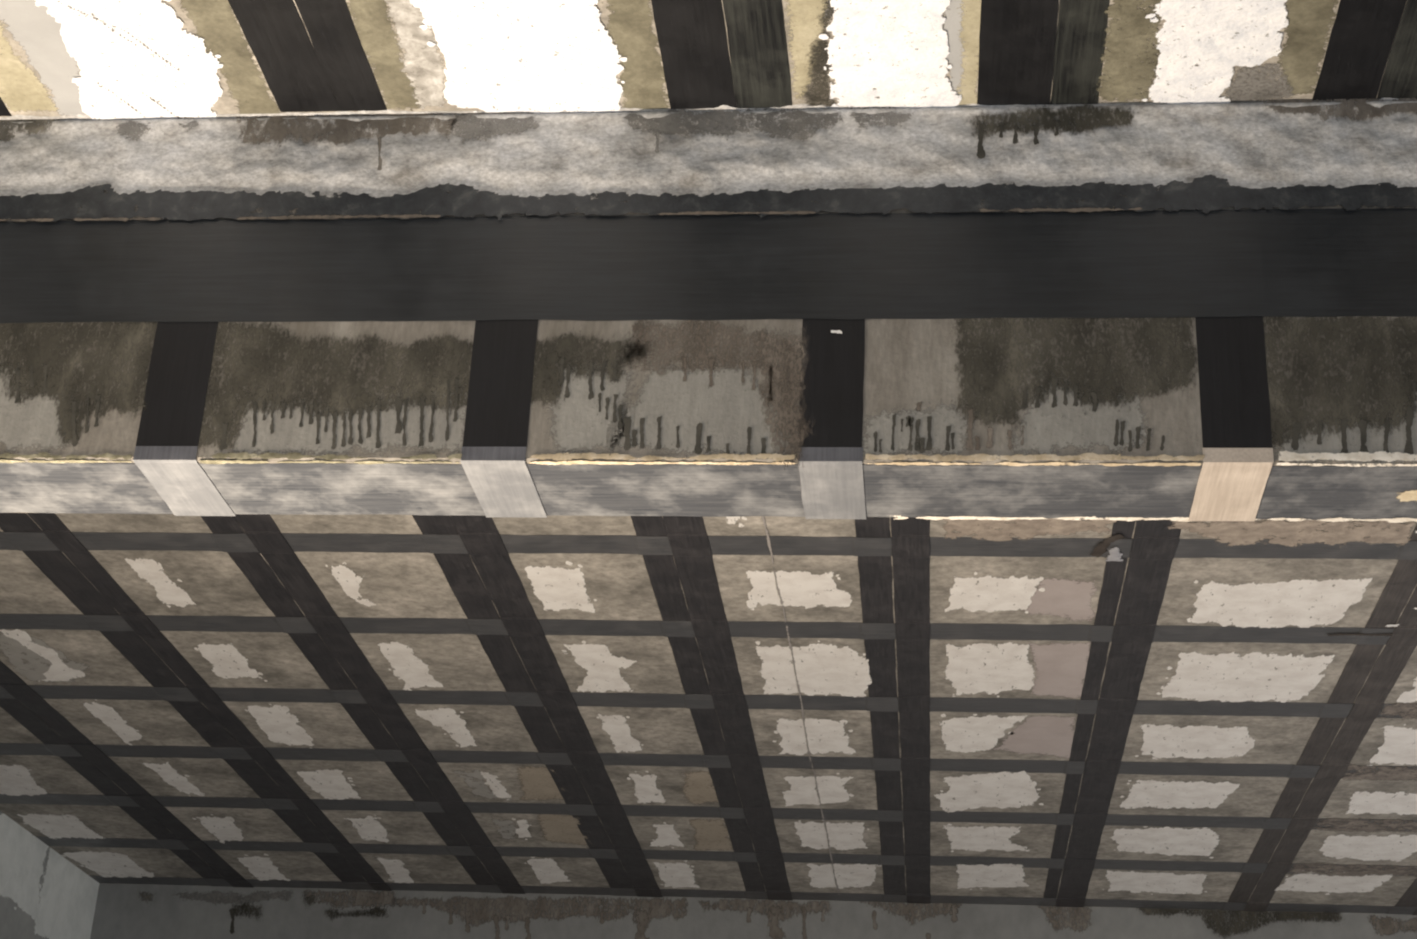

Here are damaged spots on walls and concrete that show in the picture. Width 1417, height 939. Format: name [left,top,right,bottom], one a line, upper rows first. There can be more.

peeling [35,0,223,120]
peeling [409,0,627,114]
peeling [819,0,962,109]
peeling [1141,0,1289,104]
leakage [972,104,1134,159]
leakage [0,174,1417,222]
leakage [0,322,157,446]
leakage [198,322,473,450]
leakage [531,320,801,454]
leakage [873,317,1197,453]
peeling [0,764,47,796]
peeling [0,813,154,939]